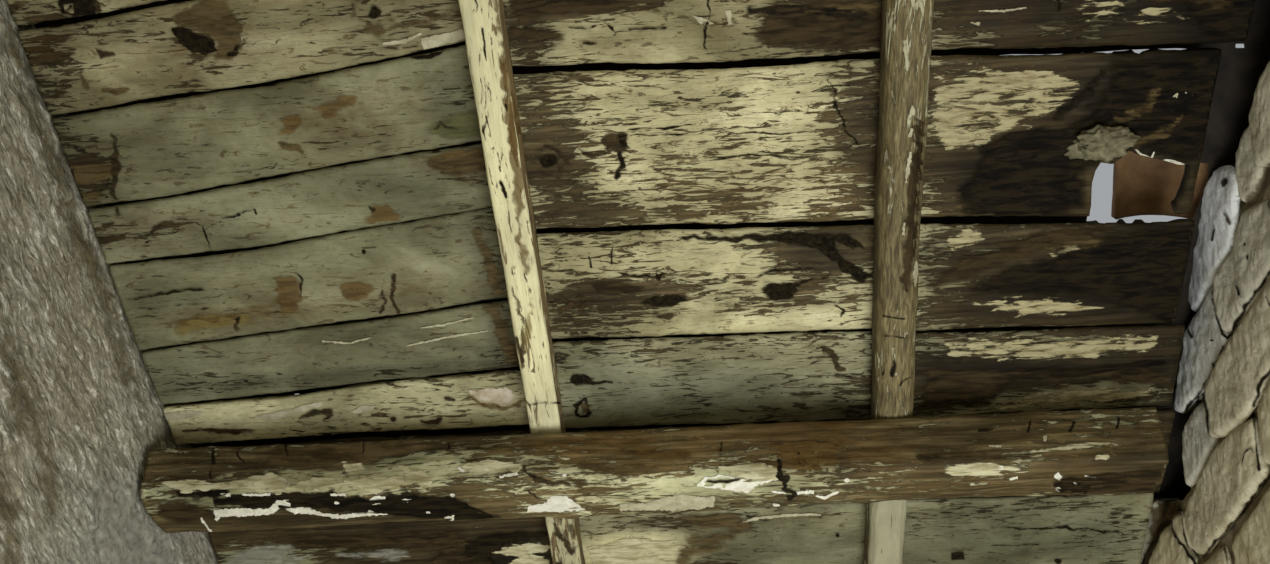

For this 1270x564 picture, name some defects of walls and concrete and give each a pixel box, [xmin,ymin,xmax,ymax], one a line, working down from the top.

leakage [509,0,638,42]
crack [569,22,667,45]
crack [703,0,711,50]
peeling [930,67,1080,150]
leakage [929,0,1254,323]
leakage [900,119,925,292]
peeling [944,334,1159,361]
peeling [161,461,433,532]
peeling [458,458,522,479]
peeling [527,462,850,523]
peeling [945,462,1028,486]
peeling [1037,435,1118,460]